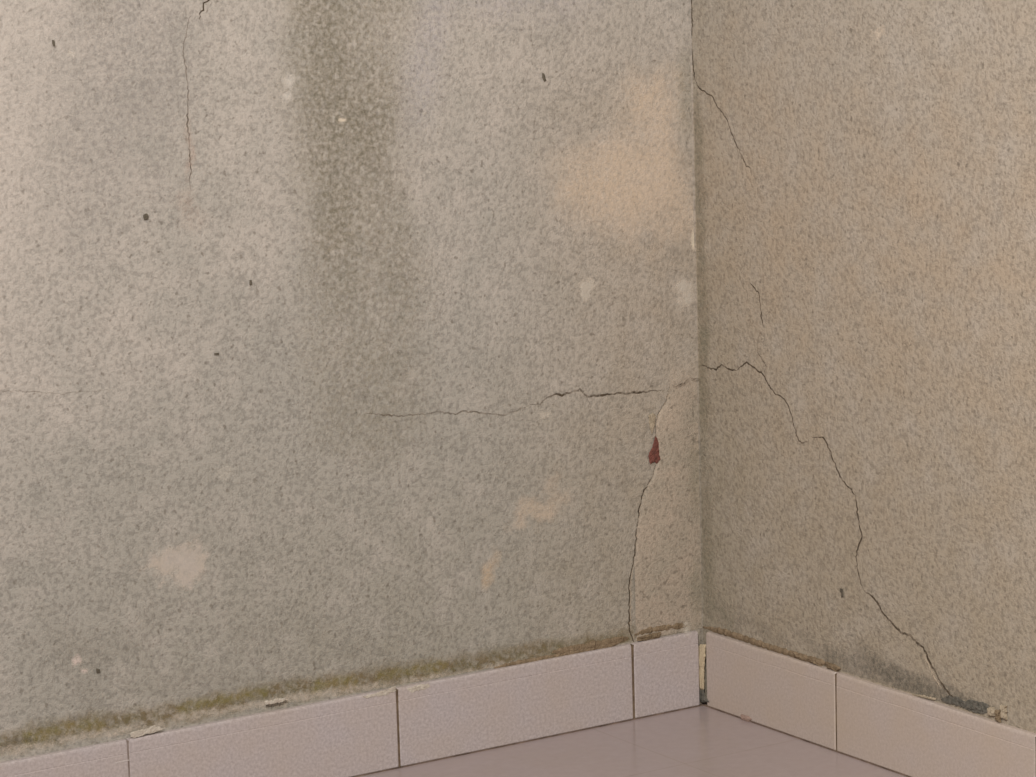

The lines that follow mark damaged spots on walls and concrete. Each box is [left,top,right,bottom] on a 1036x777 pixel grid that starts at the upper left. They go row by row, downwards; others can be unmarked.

crack [691,0,750,168]
crack [552,355,953,697]